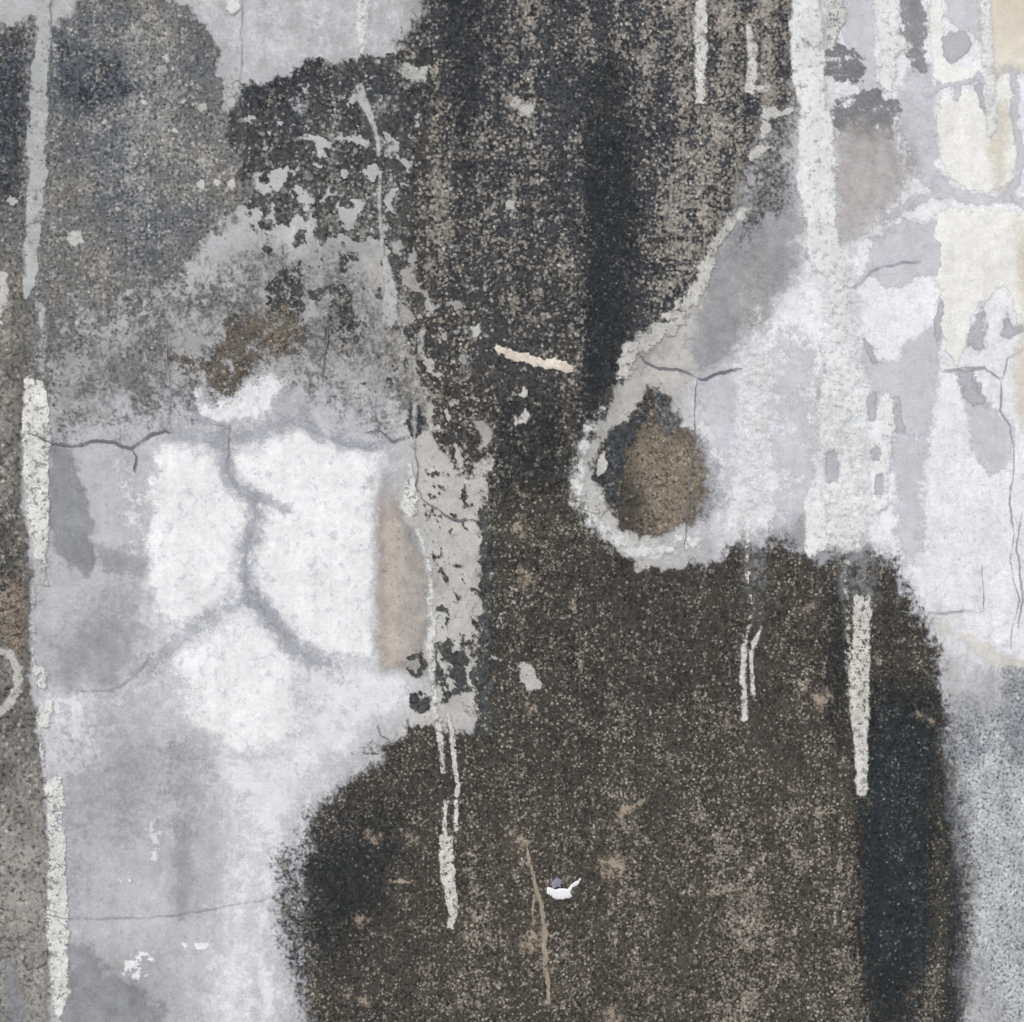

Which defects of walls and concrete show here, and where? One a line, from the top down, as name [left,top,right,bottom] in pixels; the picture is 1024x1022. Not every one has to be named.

peeling [843,0,1024,289]
peeling [967,311,988,351]
peeling [1000,313,1024,339]
crack [30,327,484,691]
damp [376,499,436,677]
damp [409,690,432,714]
damp [432,633,478,704]
damp [469,665,481,692]
crack [639,353,743,548]
peeling [861,296,944,564]
peeling [957,370,1015,476]
damp [950,642,1024,1022]